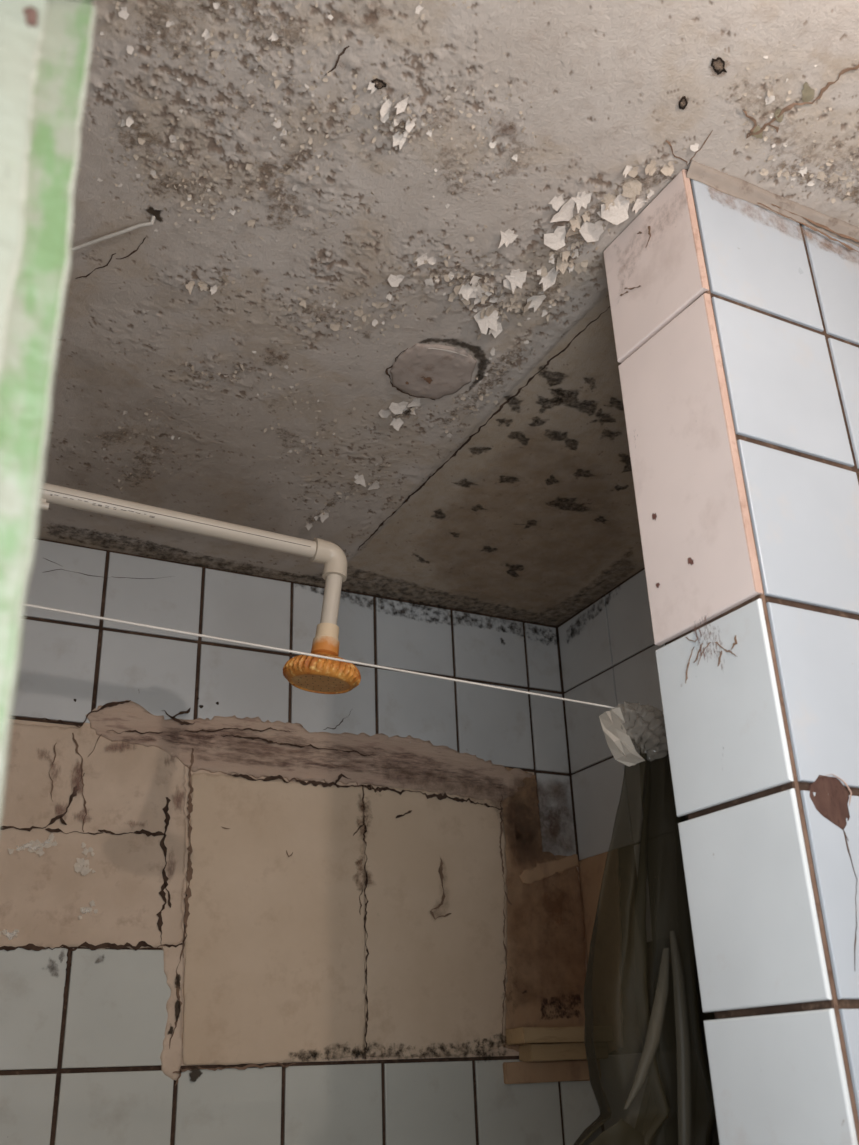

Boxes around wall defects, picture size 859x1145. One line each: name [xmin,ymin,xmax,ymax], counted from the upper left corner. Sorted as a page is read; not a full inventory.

peeling [79,0,562,268]
crack [742,109,779,138]
peeling [710,53,859,212]
peeling [181,269,236,295]
peeling [268,143,699,439]
damp [497,366,624,450]
damp [615,454,632,491]
crack [0,700,512,1086]
flaking render [0,700,608,1081]
damp [291,1035,506,1061]